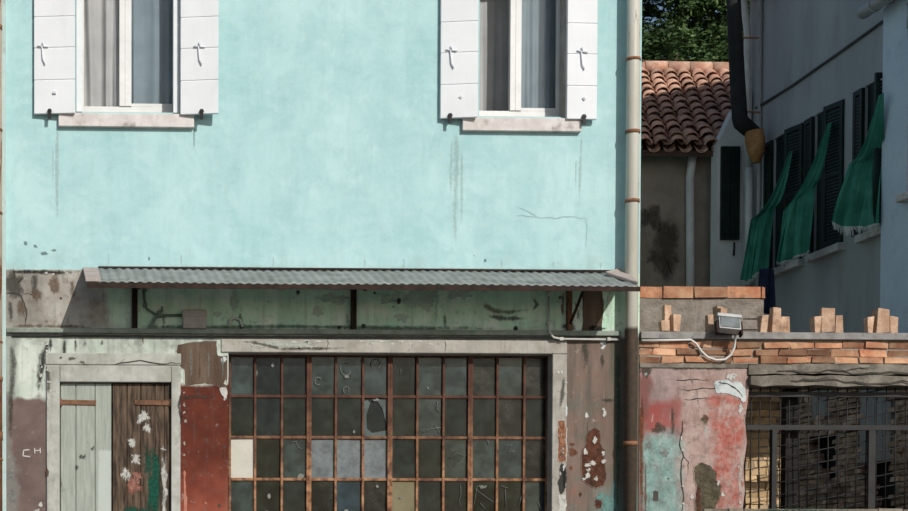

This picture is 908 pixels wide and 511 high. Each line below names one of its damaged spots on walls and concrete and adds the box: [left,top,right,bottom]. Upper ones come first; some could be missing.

crack [517,208,587,241]
water stain [641,206,678,279]
water stain [6,271,77,328]
peeling [175,340,229,423]
peeling [714,373,747,424]
spalling [556,370,616,511]
spalling [690,462,725,511]